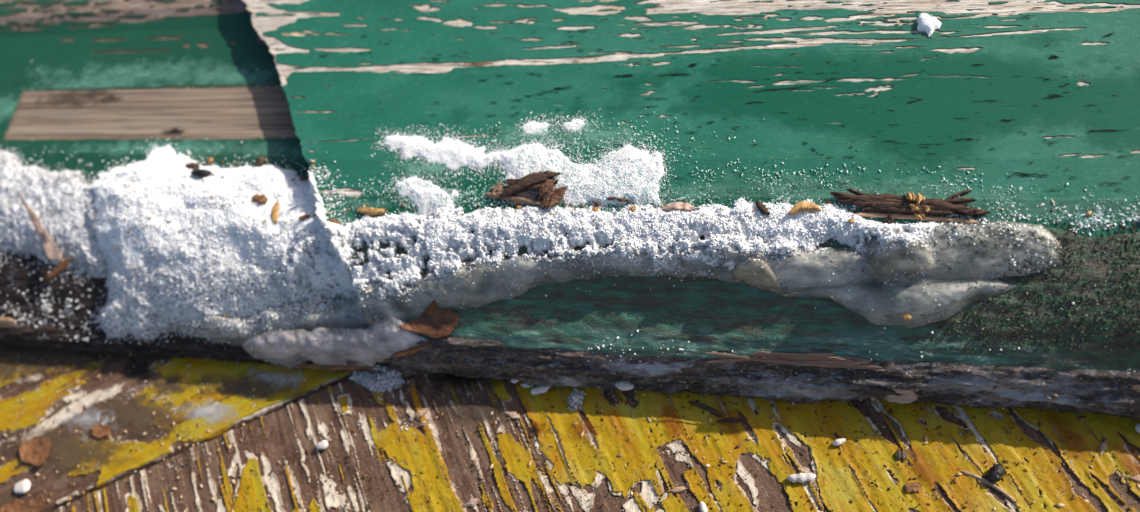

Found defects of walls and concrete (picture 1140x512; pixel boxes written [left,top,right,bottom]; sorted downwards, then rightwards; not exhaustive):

peeling [0,0,1140,140]
peeling [321,188,363,206]
leakage [440,177,522,208]
peeling [0,348,1140,512]